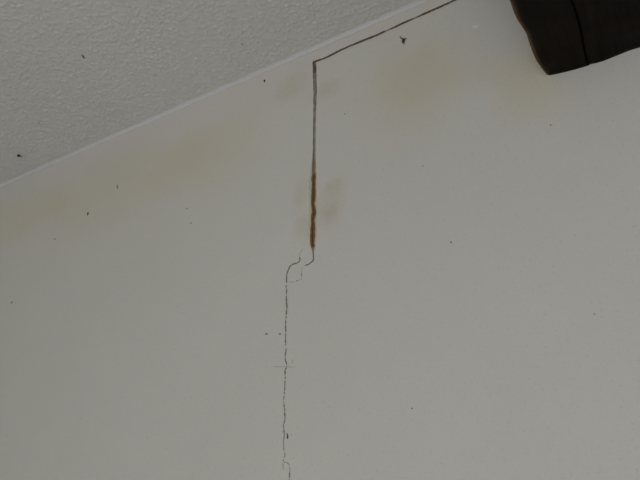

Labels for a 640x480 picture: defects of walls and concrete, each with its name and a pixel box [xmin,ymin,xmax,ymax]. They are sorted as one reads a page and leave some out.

crack [312,0,456,174]
crack [283,247,314,477]